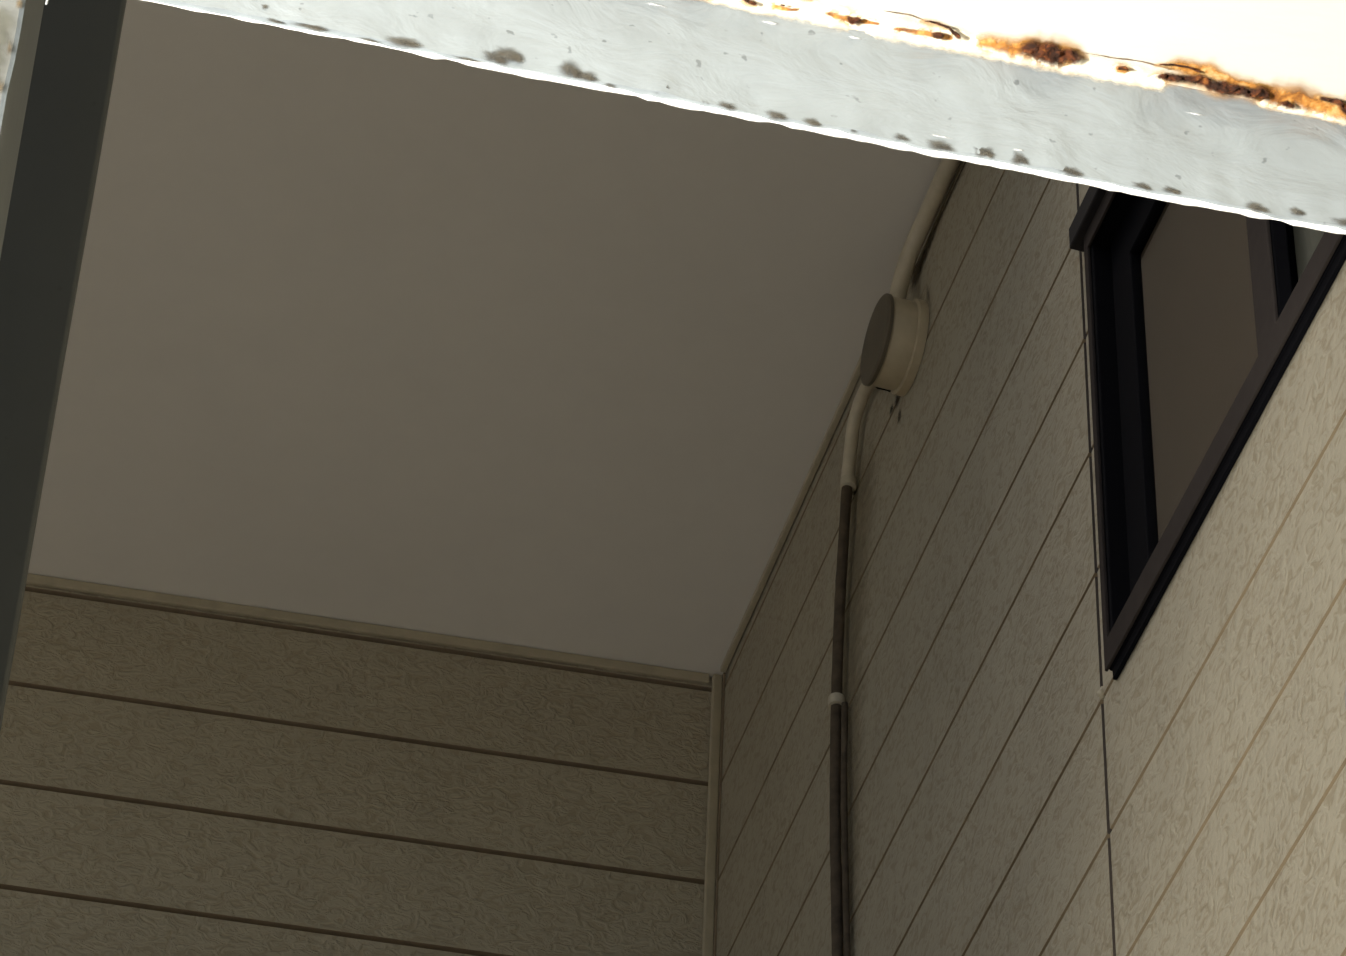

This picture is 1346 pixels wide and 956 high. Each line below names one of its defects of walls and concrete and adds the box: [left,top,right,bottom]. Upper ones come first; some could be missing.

corrosion [744,0,798,11]
corrosion [825,12,961,40]
peeling [705,0,1166,90]
corrosion [979,37,1083,66]
corrosion [1156,62,1346,117]